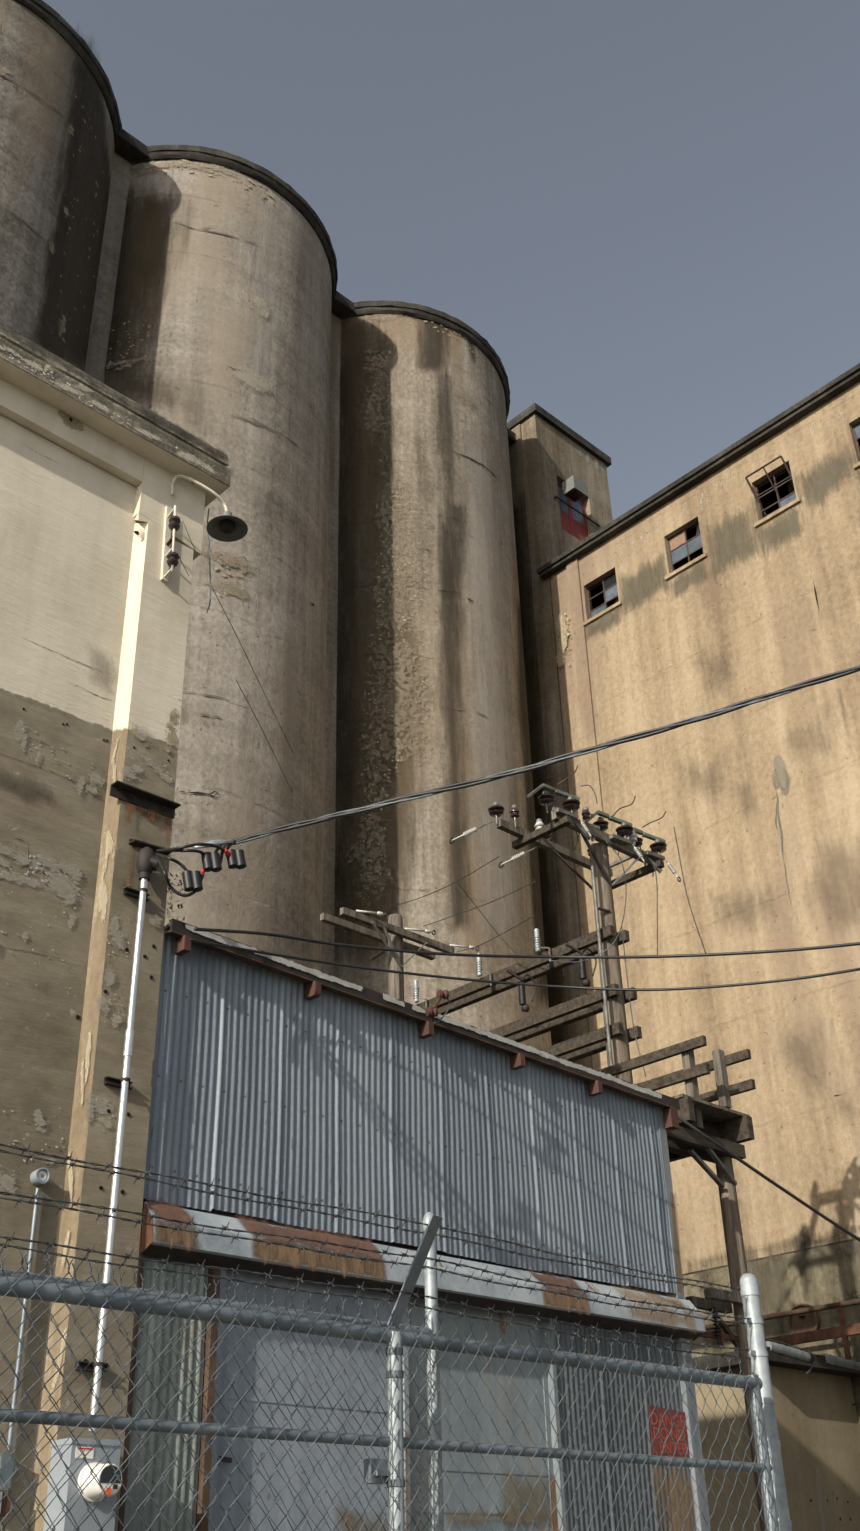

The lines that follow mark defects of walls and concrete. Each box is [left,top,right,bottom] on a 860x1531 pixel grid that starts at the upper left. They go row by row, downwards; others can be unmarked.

damp [0,46,224,457]
damp [587,453,860,634]
damp [334,323,412,956]
peeling [13,699,182,795]
damp [439,506,467,925]
peeling [0,831,129,1028]
peeling [0,1108,73,1198]
peeling [52,1328,67,1389]
rust [147,1198,197,1250]
rust [237,1216,386,1280]
rust [531,1271,590,1315]
rust [623,1195,740,1346]